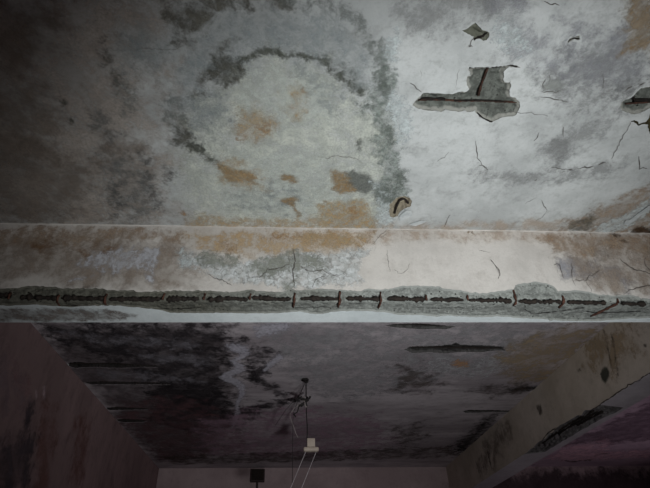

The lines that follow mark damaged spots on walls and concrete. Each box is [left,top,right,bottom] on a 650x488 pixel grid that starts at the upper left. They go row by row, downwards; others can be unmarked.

spalling [462,23,489,41]
damp [0,0,232,224]
damp [166,15,395,228]
spalling [331,28,520,228]
spalling [620,87,650,132]
rust [219,163,257,184]
spalling [0,247,650,330]
crack [620,257,650,293]
damp [1,309,529,464]
spalling [404,343,505,354]